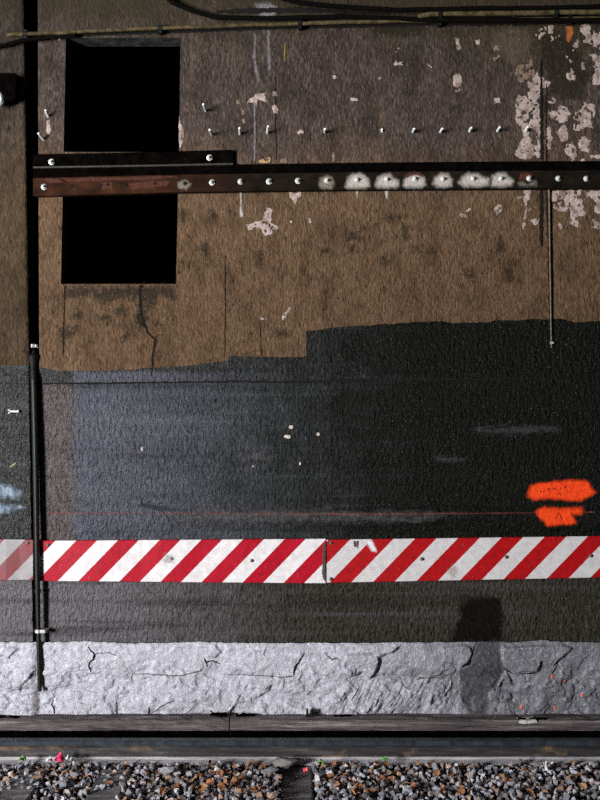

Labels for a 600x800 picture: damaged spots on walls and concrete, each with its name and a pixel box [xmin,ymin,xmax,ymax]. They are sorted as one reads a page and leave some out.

peeling [566,24,600,85]
peeling [515,59,600,161]
rust [45,176,177,190]
damp [319,176,334,194]
damp [346,173,535,199]
peeling [246,208,278,236]
peeling [550,190,600,229]
crack [38,285,559,385]
crack [88,647,116,672]
crack [131,653,304,686]
crack [416,646,474,687]
crack [504,662,558,678]